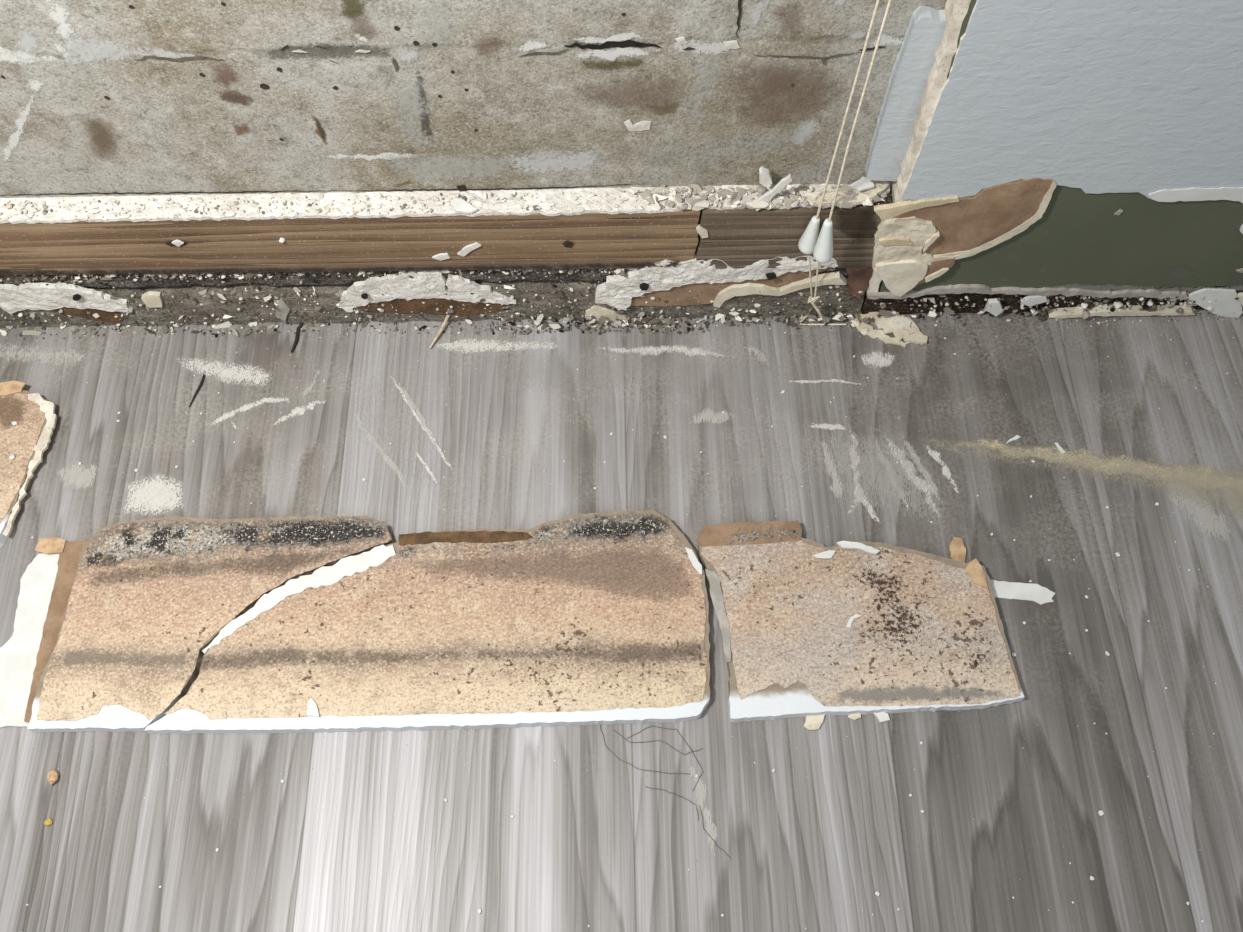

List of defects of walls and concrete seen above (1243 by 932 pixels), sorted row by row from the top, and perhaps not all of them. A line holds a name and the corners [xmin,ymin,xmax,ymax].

crack [736,0,861,65]
crack [519,32,660,69]
peeling [1148,187,1243,203]
spalling [141,291,163,308]
spalling [1021,294,1047,307]
spalling [850,318,869,335]